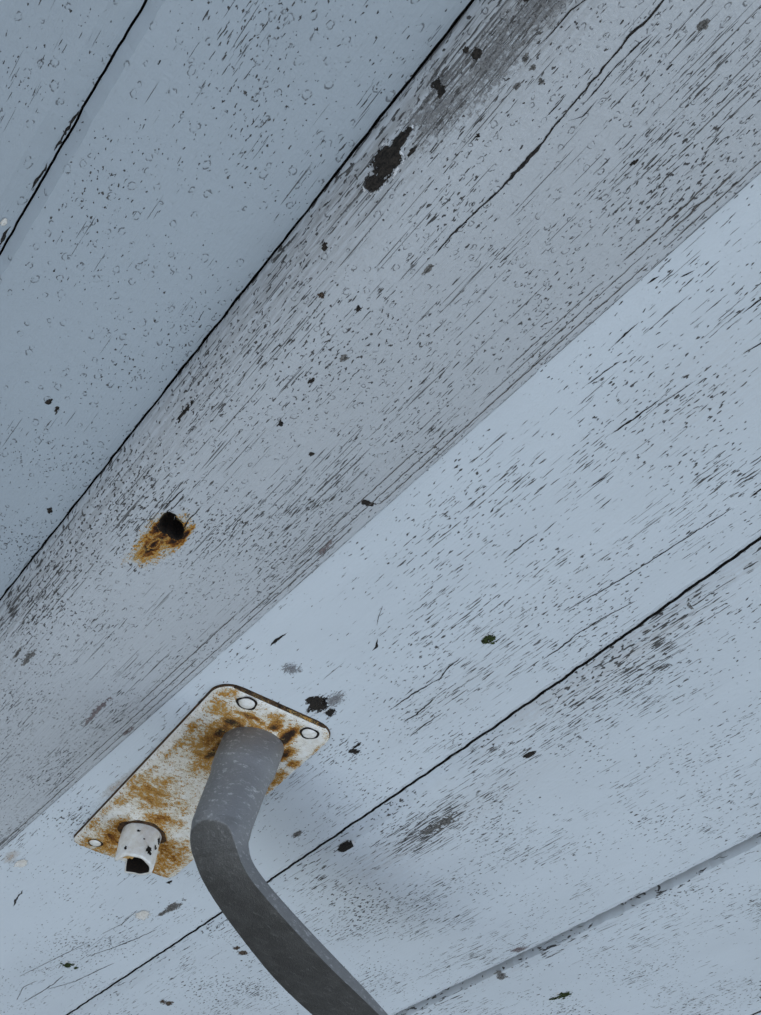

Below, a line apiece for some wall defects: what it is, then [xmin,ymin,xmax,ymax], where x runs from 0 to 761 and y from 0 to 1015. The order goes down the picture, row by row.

peeling [363,125,417,195]
crack [434,0,664,256]
corrosion [123,508,196,568]
peeling [305,695,337,718]
corrosion [76,687,329,878]